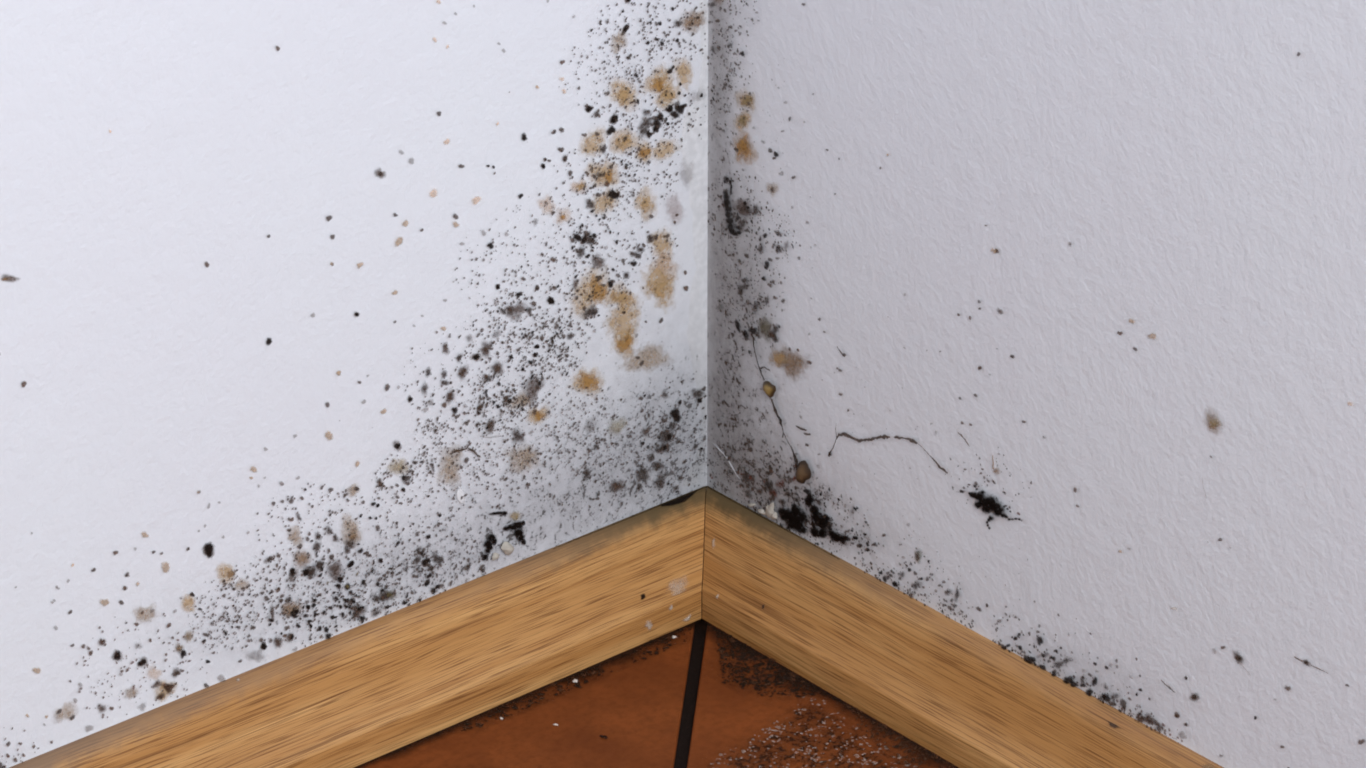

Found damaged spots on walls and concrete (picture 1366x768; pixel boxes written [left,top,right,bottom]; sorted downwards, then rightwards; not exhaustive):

water stain [69,0,1188,743]
crack [751,333,948,474]
water stain [0,714,53,768]
water stain [716,705,901,768]